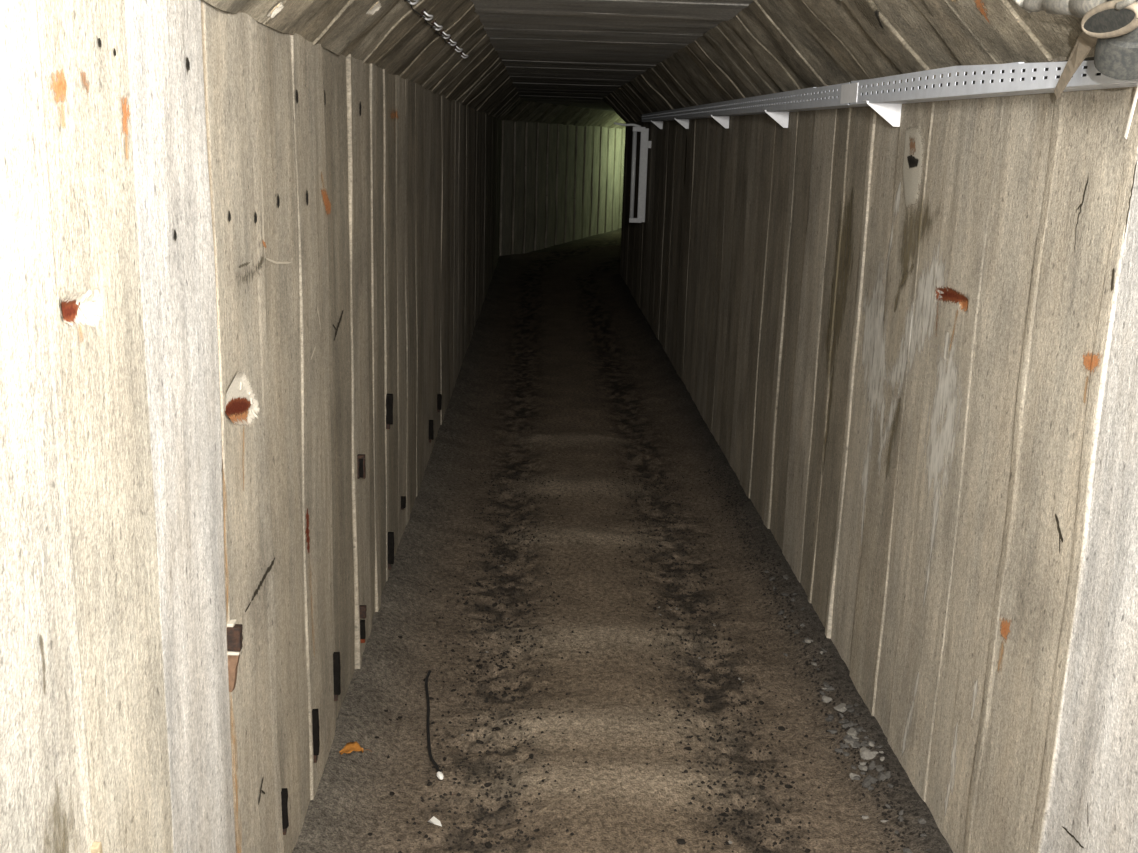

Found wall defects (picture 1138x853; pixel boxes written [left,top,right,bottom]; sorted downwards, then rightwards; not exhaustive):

corrosion [51,69,67,127]
spalling [59,290,103,341]
corrosion [935,287,968,350]
corrosion [1083,352,1102,403]
spalling [225,370,260,453]